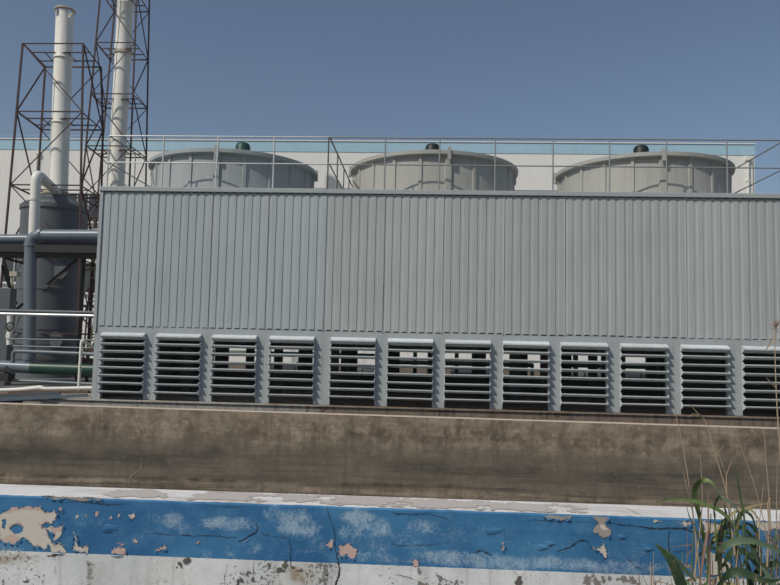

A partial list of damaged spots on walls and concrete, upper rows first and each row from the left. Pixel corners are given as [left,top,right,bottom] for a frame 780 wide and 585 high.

peeling [0,489,173,557]
crack [326,495,340,585]
peeling [185,491,611,560]
peeling [700,520,720,537]
spalling [583,574,639,585]